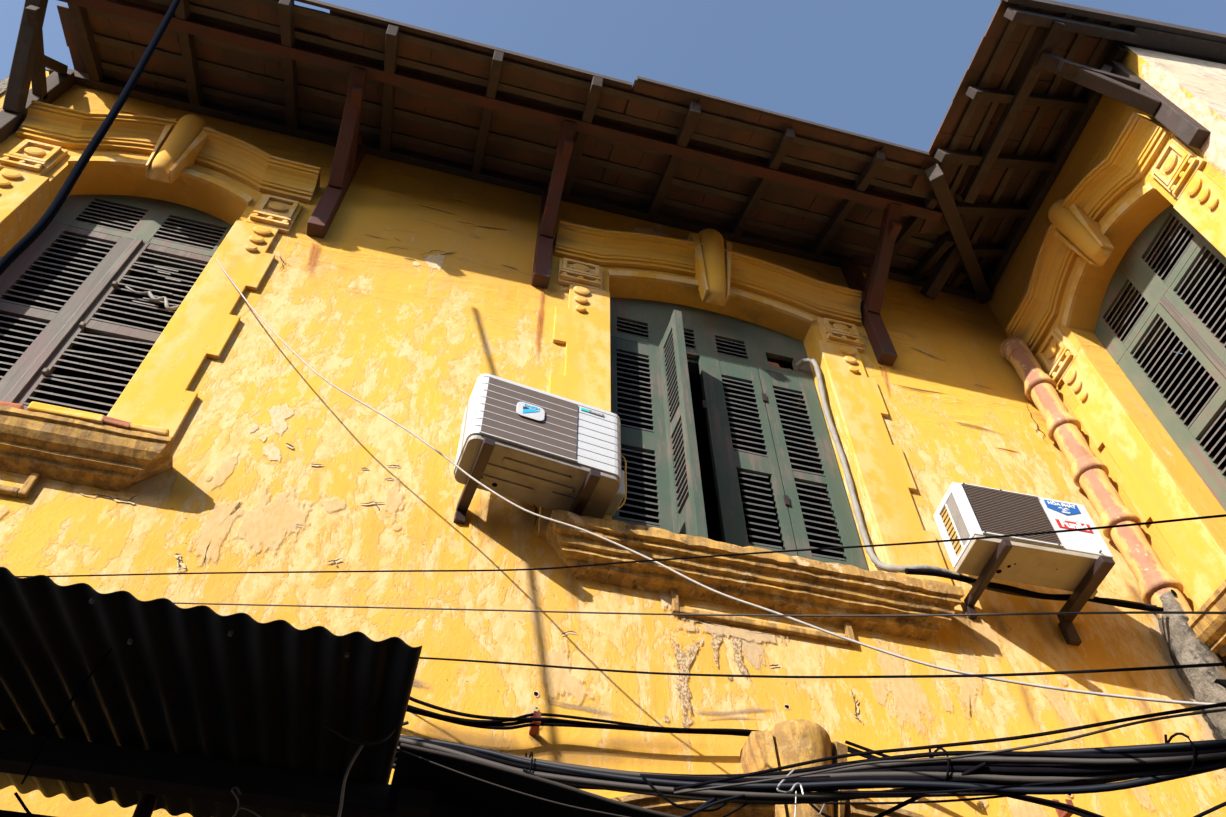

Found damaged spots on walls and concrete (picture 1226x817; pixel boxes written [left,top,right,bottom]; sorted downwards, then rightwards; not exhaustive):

peeling [1142,63,1226,184]
peeling [249,403,294,461]
peeling [176,453,345,572]
spalling [659,592,790,742]